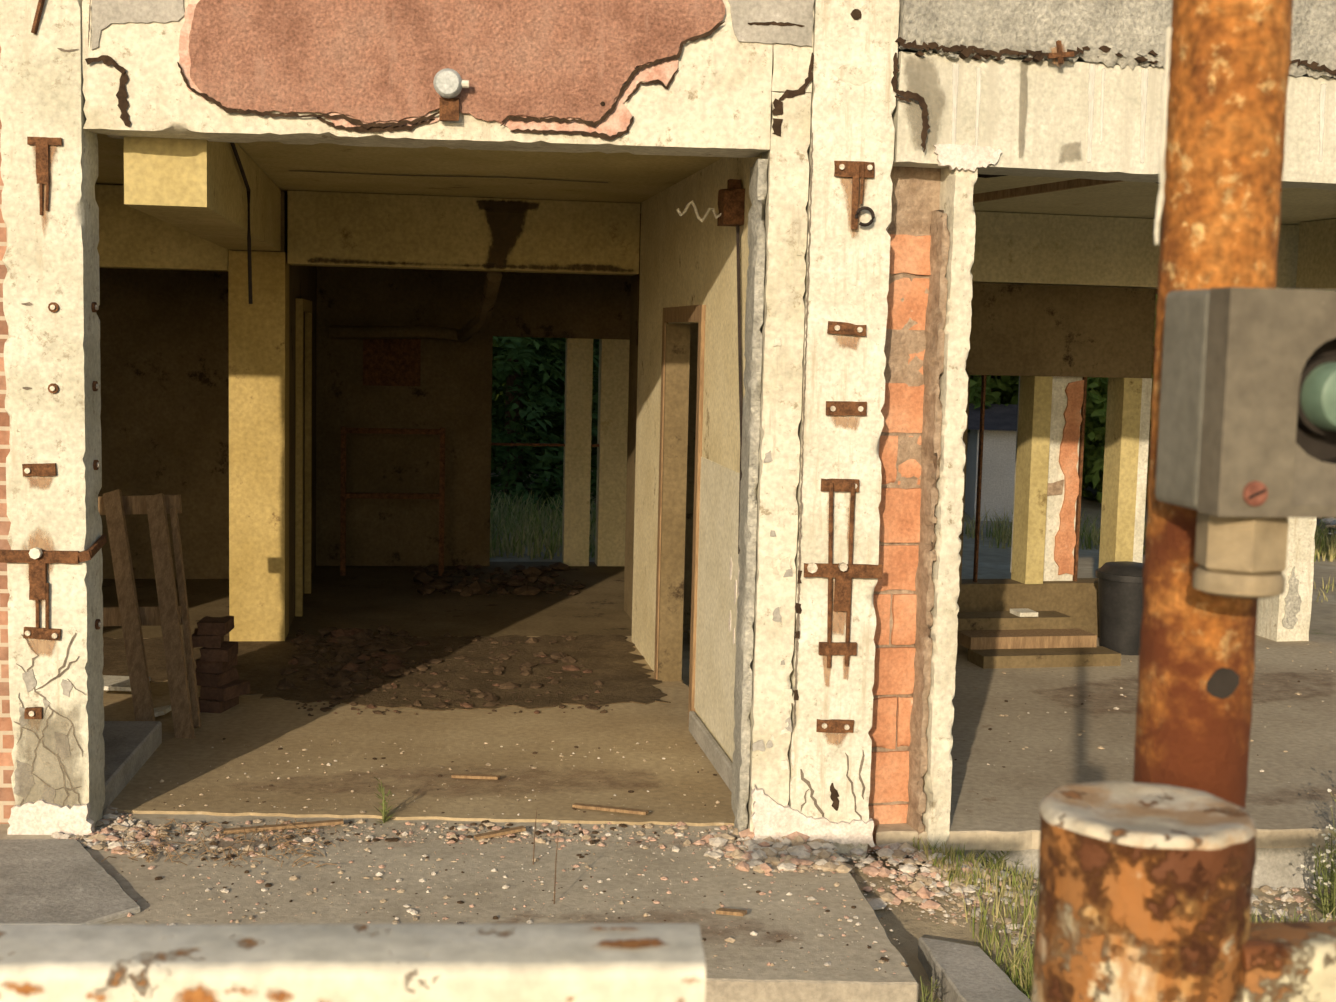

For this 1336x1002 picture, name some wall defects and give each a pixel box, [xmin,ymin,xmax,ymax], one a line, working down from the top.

flaking render [91,0,814,136]
spalling [1290,59,1336,78]
water stain [308,200,633,272]
crack [772,53,814,732]
spalling [1047,380,1084,575]
corrosion [823,655,850,686]
crack [14,633,85,807]
crack [800,751,865,820]
corrosion [590,927,665,948]
corrosion [2,983,43,995]
corrosion [178,986,250,1002]
corrosion [268,991,292,1002]